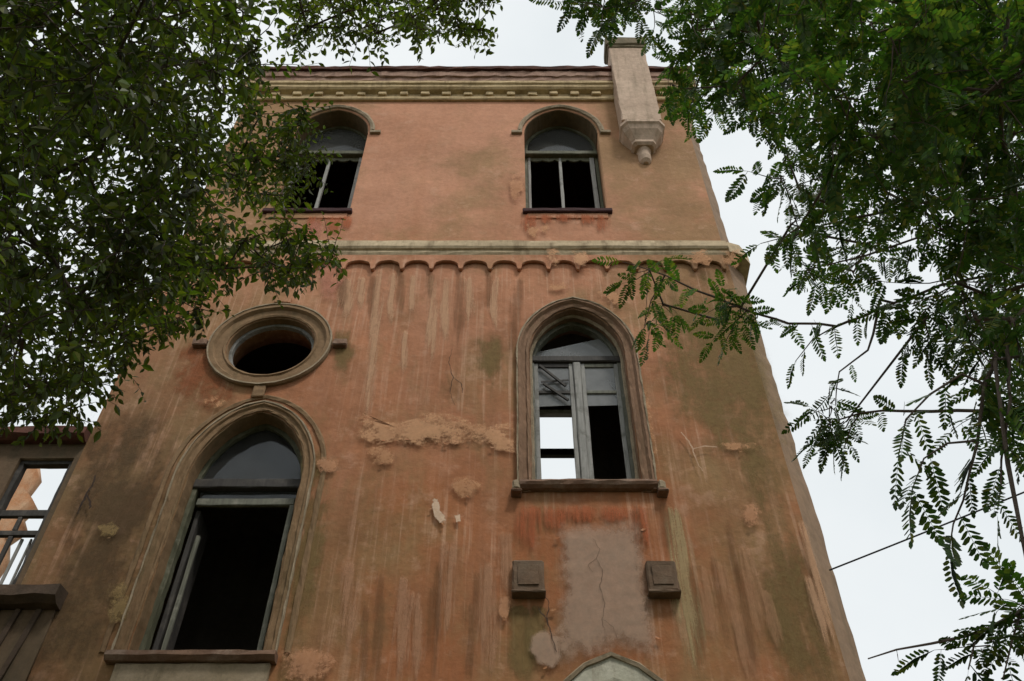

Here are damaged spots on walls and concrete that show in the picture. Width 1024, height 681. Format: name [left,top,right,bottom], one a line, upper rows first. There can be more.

peeling [574,252,589,265]
damp [323,268,396,410]
damp [409,275,450,355]
damp [667,303,768,482]
peeling [317,459,337,472]
peeling [361,413,515,464]
spalling [98,522,119,538]
spalling [430,498,461,525]
damp [396,578,422,672]
damp [667,508,704,661]
damp [767,523,834,670]